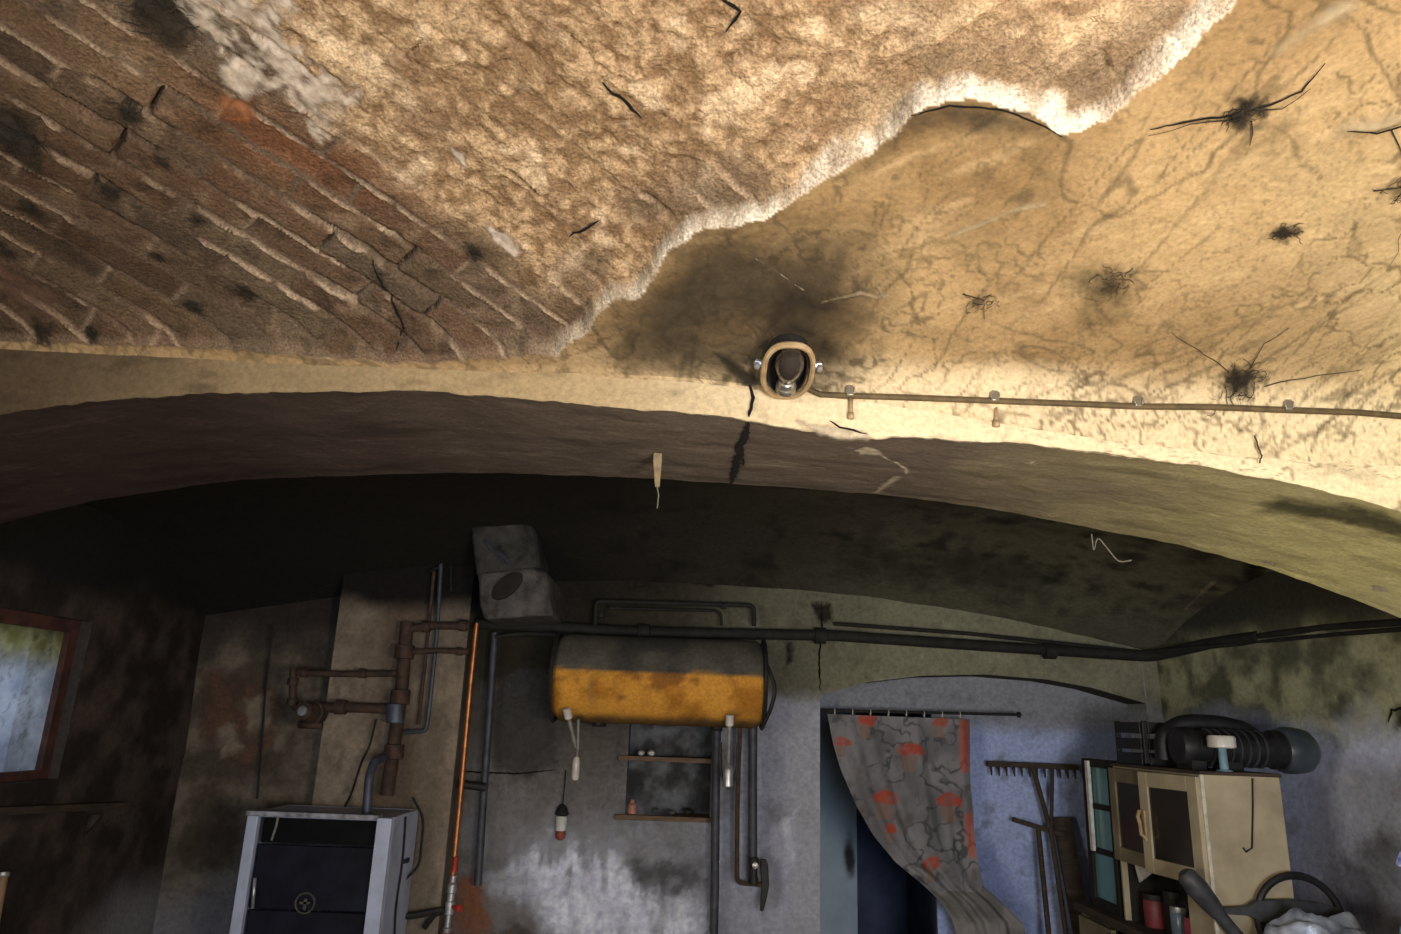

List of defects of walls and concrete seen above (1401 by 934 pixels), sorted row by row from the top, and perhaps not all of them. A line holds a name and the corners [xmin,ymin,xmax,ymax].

crack [722,0,742,32]
efflorescence [173,0,362,144]
crack [602,82,642,118]
crack [911,105,1062,137]
crack [1150,63,1325,130]
flaking render [0,0,1235,364]
damp [721,357,757,386]
crack [730,386,755,484]
damp [1269,501,1401,534]
damp [508,843,703,934]